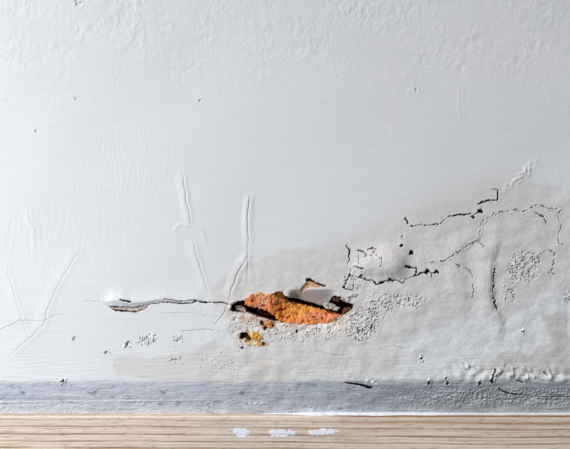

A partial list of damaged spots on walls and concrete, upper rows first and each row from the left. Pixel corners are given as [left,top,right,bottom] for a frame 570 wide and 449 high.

crack [84,297,228,335]
spalling [215,244,432,352]
water stain [111,164,570,386]
crack [340,187,567,314]